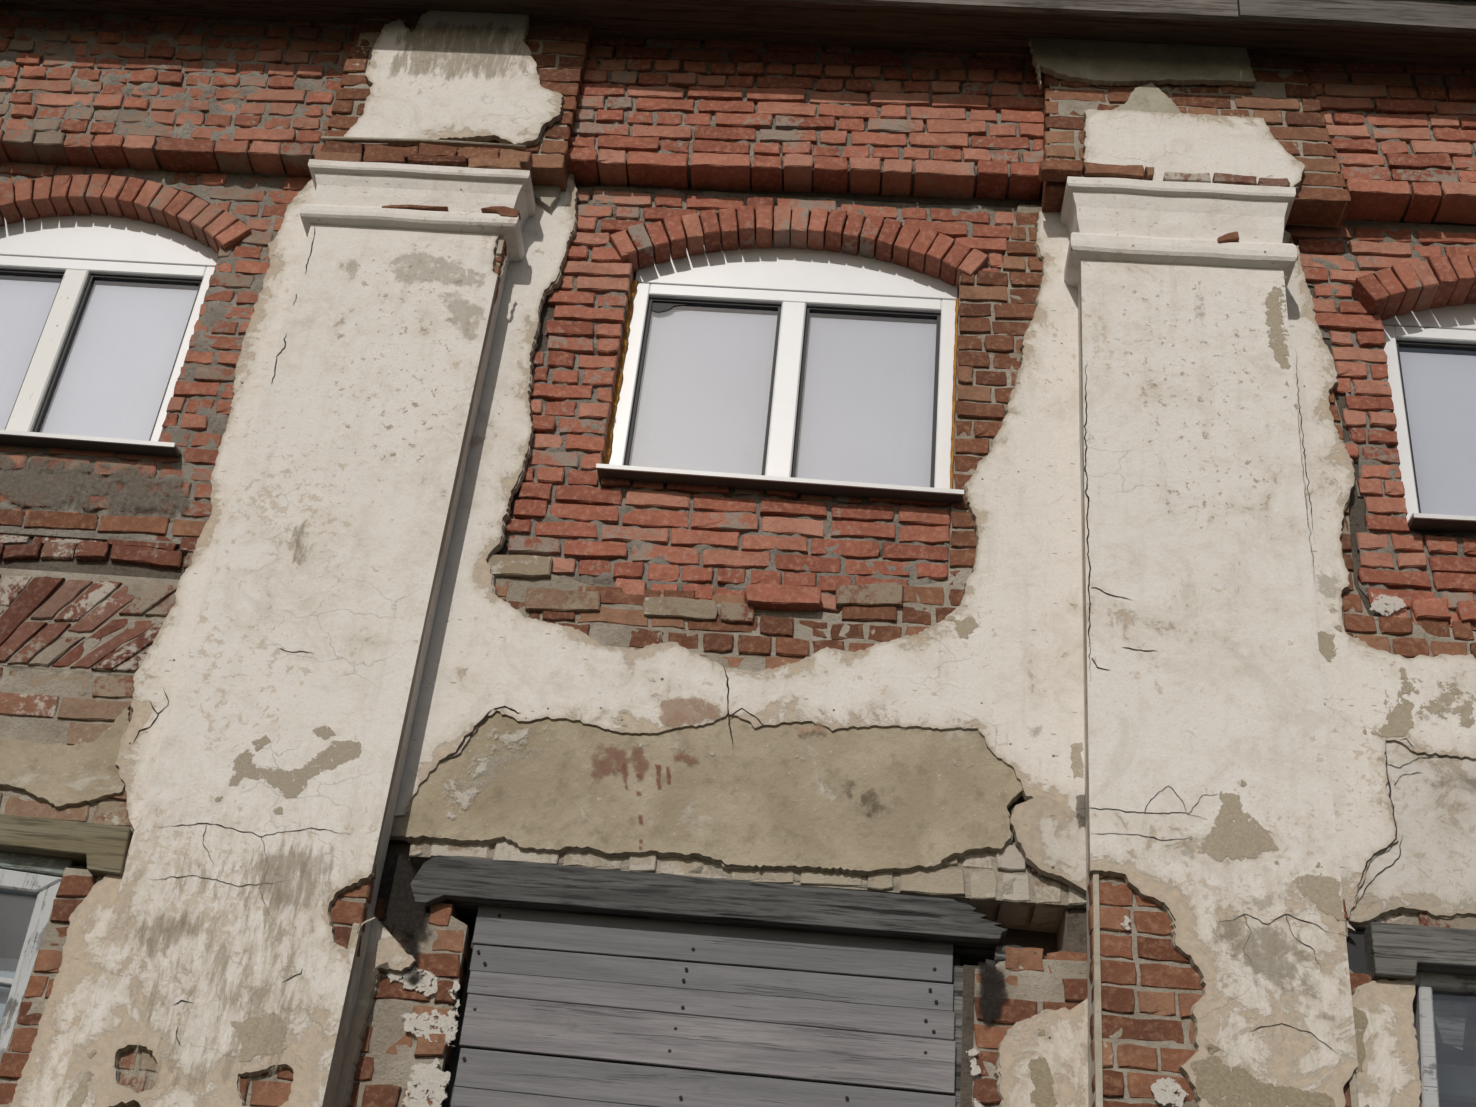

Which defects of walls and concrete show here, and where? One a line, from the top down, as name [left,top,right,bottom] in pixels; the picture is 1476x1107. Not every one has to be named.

flaking render [315,13,1351,672]
flaking render [0,451,219,547]
flaking render [1317,359,1476,750]
flaking render [0,568,179,745]
crack [151,823,351,915]
peeling [215,725,361,814]
flaking render [328,866,475,1107]
flaking render [408,793,1394,1107]
crack [1082,785,1216,841]
peeling [1189,780,1279,864]
crack [1221,737,1441,966]
peeling [1293,862,1476,939]